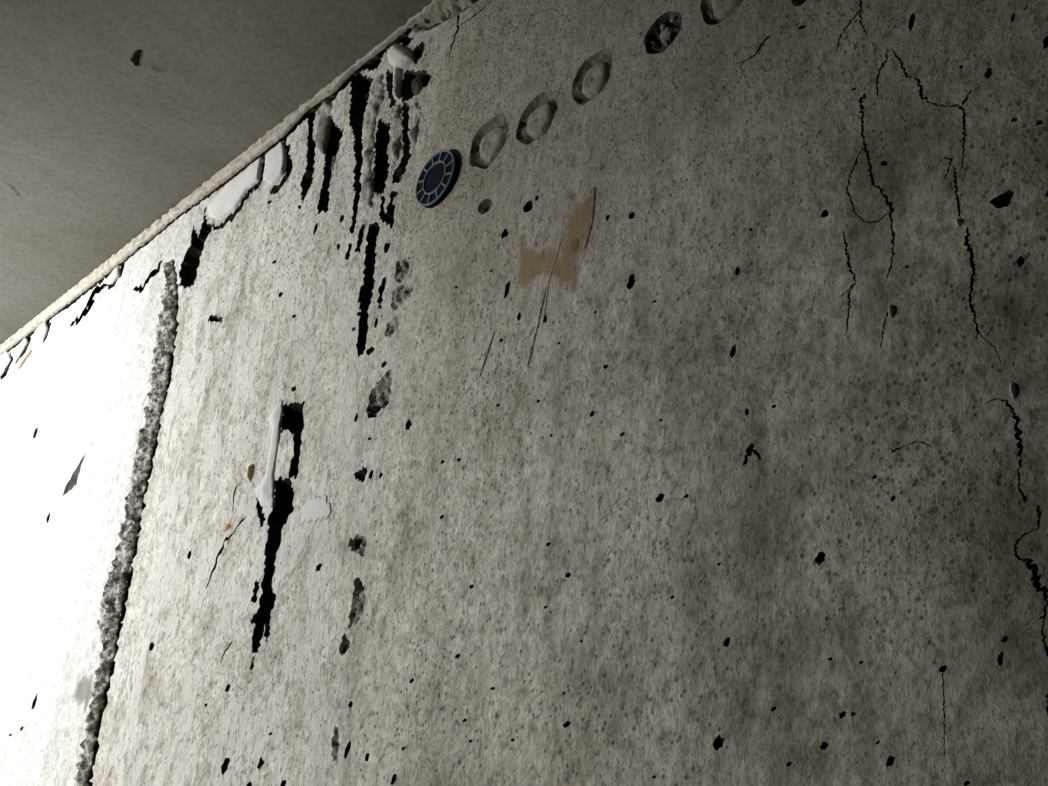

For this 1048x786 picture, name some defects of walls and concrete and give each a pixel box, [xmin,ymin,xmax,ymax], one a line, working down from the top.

crack [836,0,867,52]
damp [387,43,415,99]
peeling [179,138,293,289]
peeling [103,262,124,290]
spalling [384,256,413,338]
peeling [0,318,52,380]
crack [840,49,1048,657]
spalling [366,369,393,419]
spalling [62,437,96,497]
spalling [353,466,368,482]
peeling [247,400,331,670]
crack [939,672,947,756]